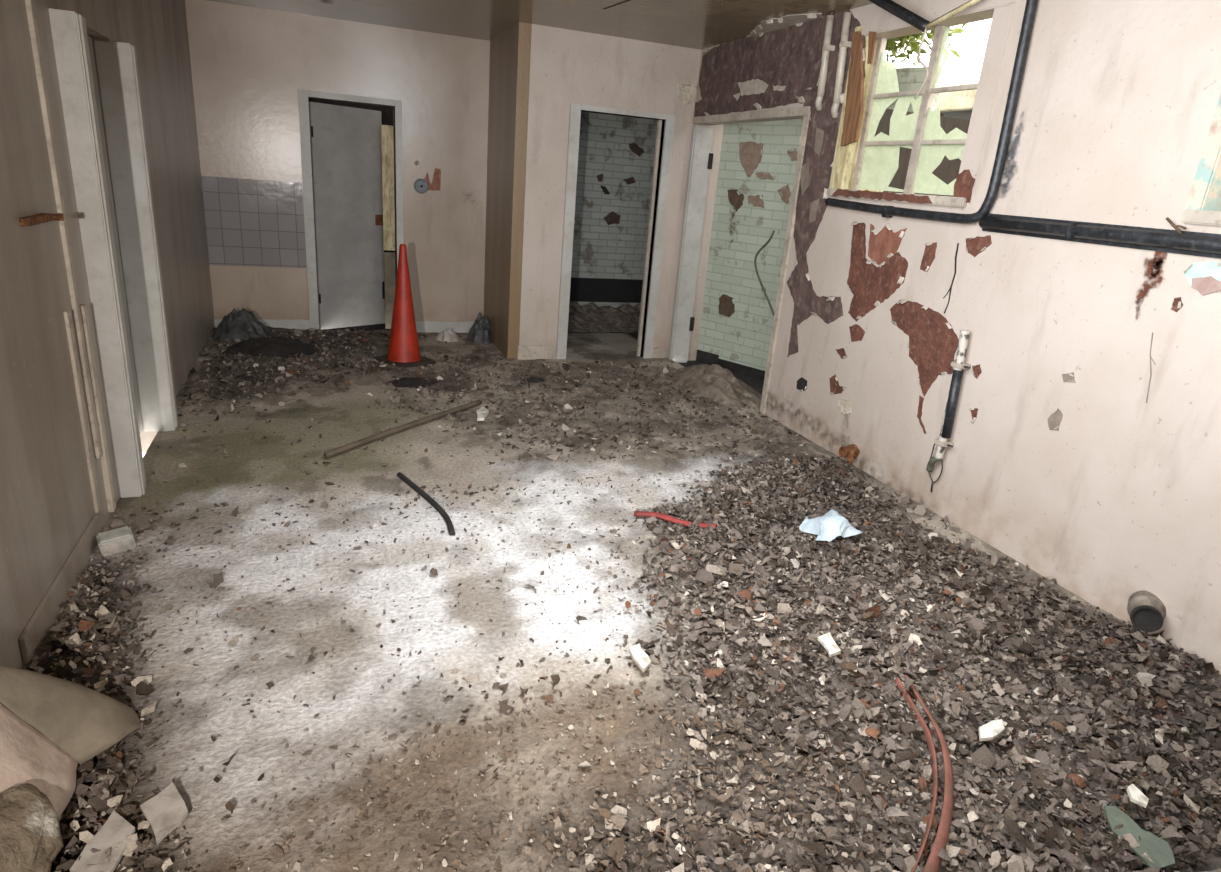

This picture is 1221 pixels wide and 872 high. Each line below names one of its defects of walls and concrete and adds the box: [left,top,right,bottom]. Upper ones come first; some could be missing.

flaking render [676,10,959,434]
flaking render [966,235,992,257]